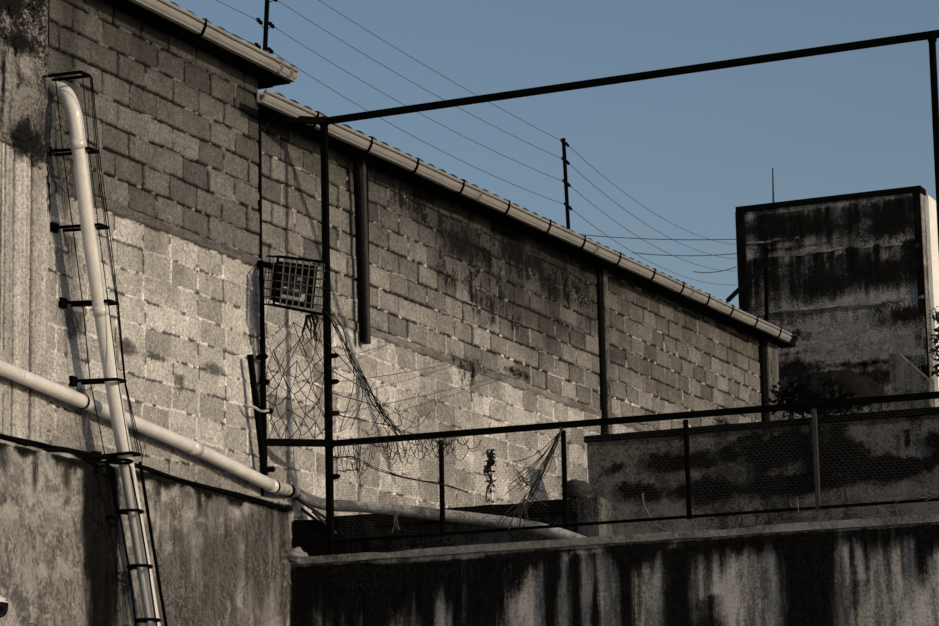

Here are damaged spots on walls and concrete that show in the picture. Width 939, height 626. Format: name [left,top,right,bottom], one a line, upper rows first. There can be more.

leakage [738,196,924,328]
leakage [778,356,826,383]
leakage [0,442,38,492]
leakage [608,422,939,505]
leakage [52,454,144,626]
leakage [135,471,939,626]